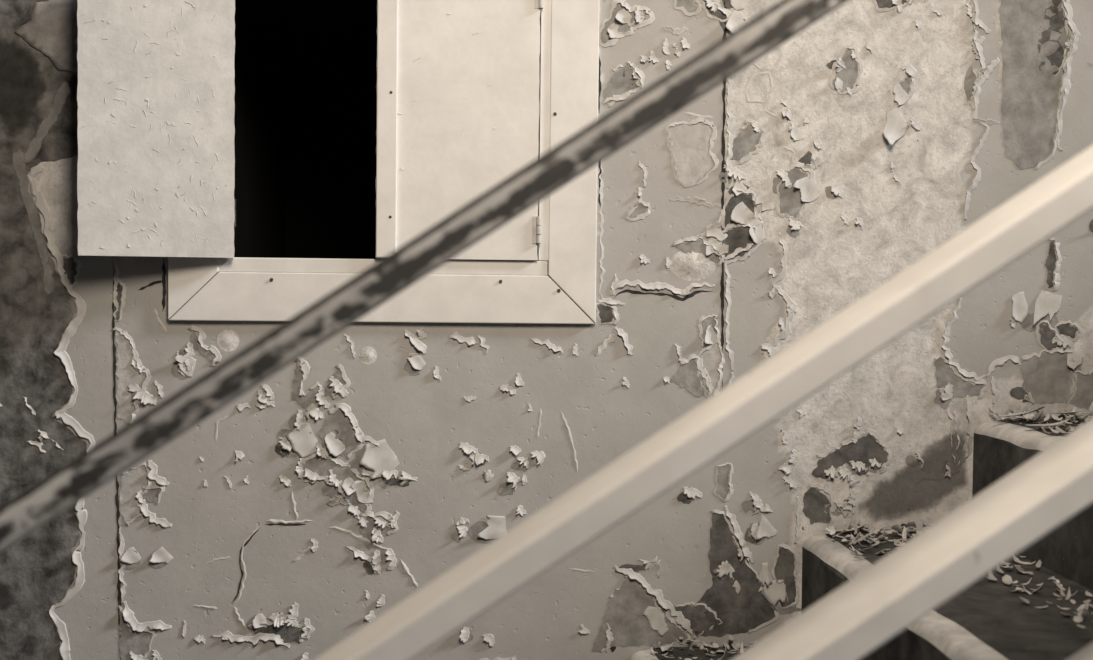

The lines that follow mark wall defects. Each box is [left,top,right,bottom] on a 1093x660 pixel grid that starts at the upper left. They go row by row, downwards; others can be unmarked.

flaking render [0,0,95,507]
peeling [111,279,163,424]
peeling [598,0,747,114]
peeling [665,63,844,358]
peeling [934,237,1093,478]
flaking render [964,0,1081,220]
flaking render [0,499,88,660]
peeling [119,460,172,528]
peeling [117,601,315,660]
peeling [275,357,418,588]
peeling [450,442,546,544]
flaking render [579,417,892,653]